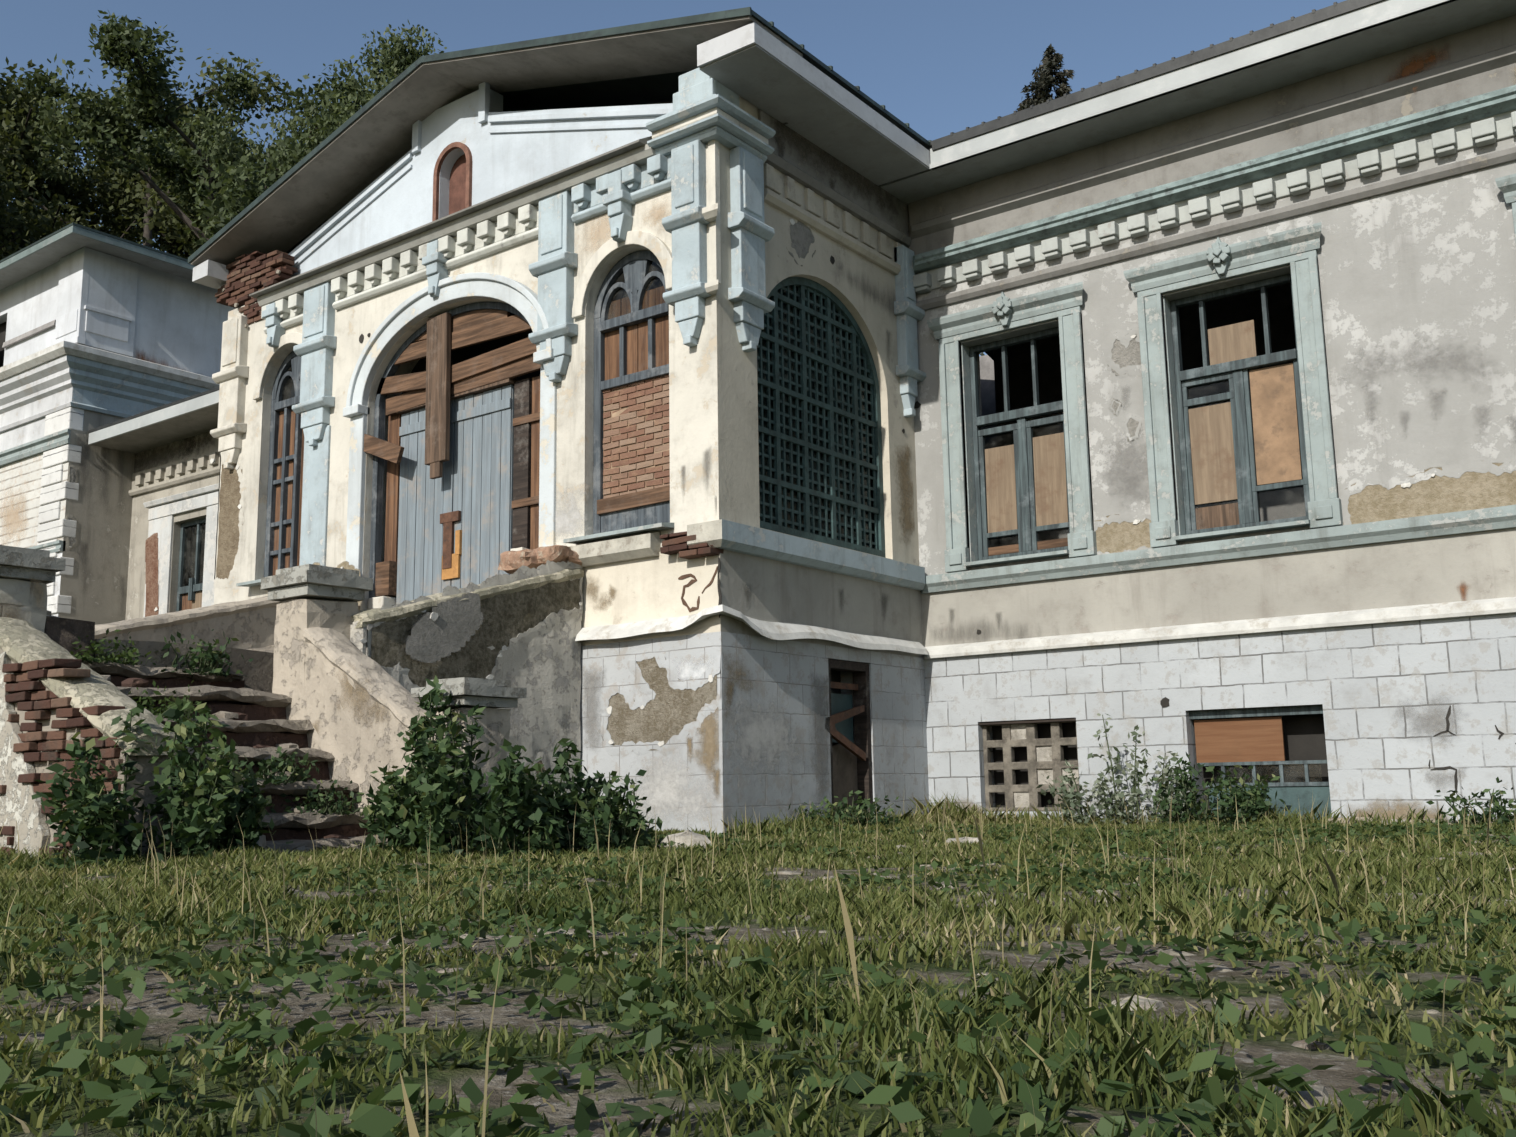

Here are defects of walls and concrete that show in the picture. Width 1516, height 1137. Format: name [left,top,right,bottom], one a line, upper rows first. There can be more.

rust [1395,52,1442,80]
flaking render [215,250,298,328]
flaking render [210,451,247,590]
damp [898,447,914,533]
flaking render [1338,455,1516,525]
flaking render [358,560,583,699]
crack [678,558,722,618]
flaking render [0,651,125,858]
flaking render [598,642,796,817]
crack [1428,706,1458,794]